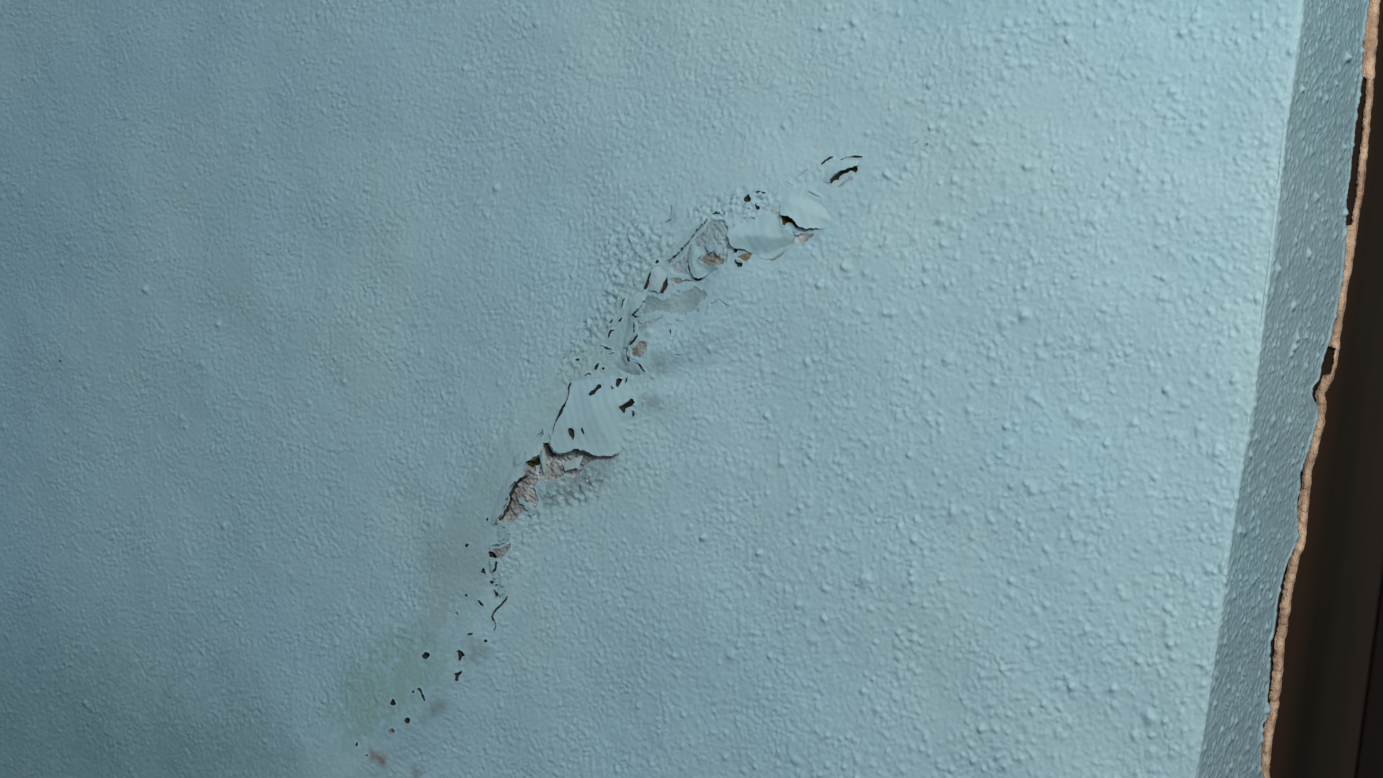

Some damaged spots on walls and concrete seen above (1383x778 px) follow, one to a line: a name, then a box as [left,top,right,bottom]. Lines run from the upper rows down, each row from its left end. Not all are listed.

peeling [557,153,864,380]
spalling [481,439,621,578]